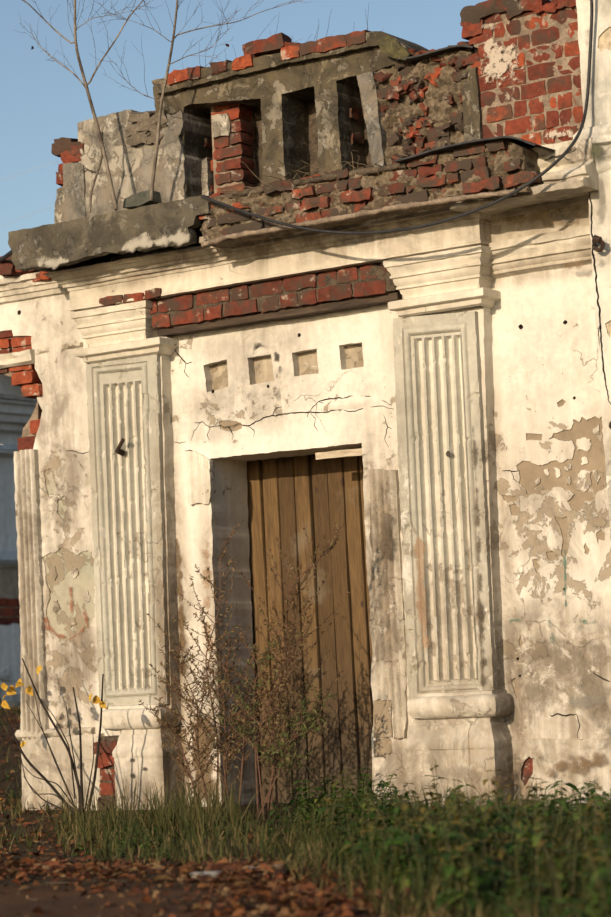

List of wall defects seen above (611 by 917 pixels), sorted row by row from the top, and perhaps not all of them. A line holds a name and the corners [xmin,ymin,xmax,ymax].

peeling [598,27,611,51]
spalling [51,137,84,186]
crack [176,396,392,451]
peeling [503,495,520,516]
peeling [517,416,607,571]
spalling [0,567,20,626]
peeling [43,548,96,641]
peeling [0,666,21,711]
crack [551,713,583,740]